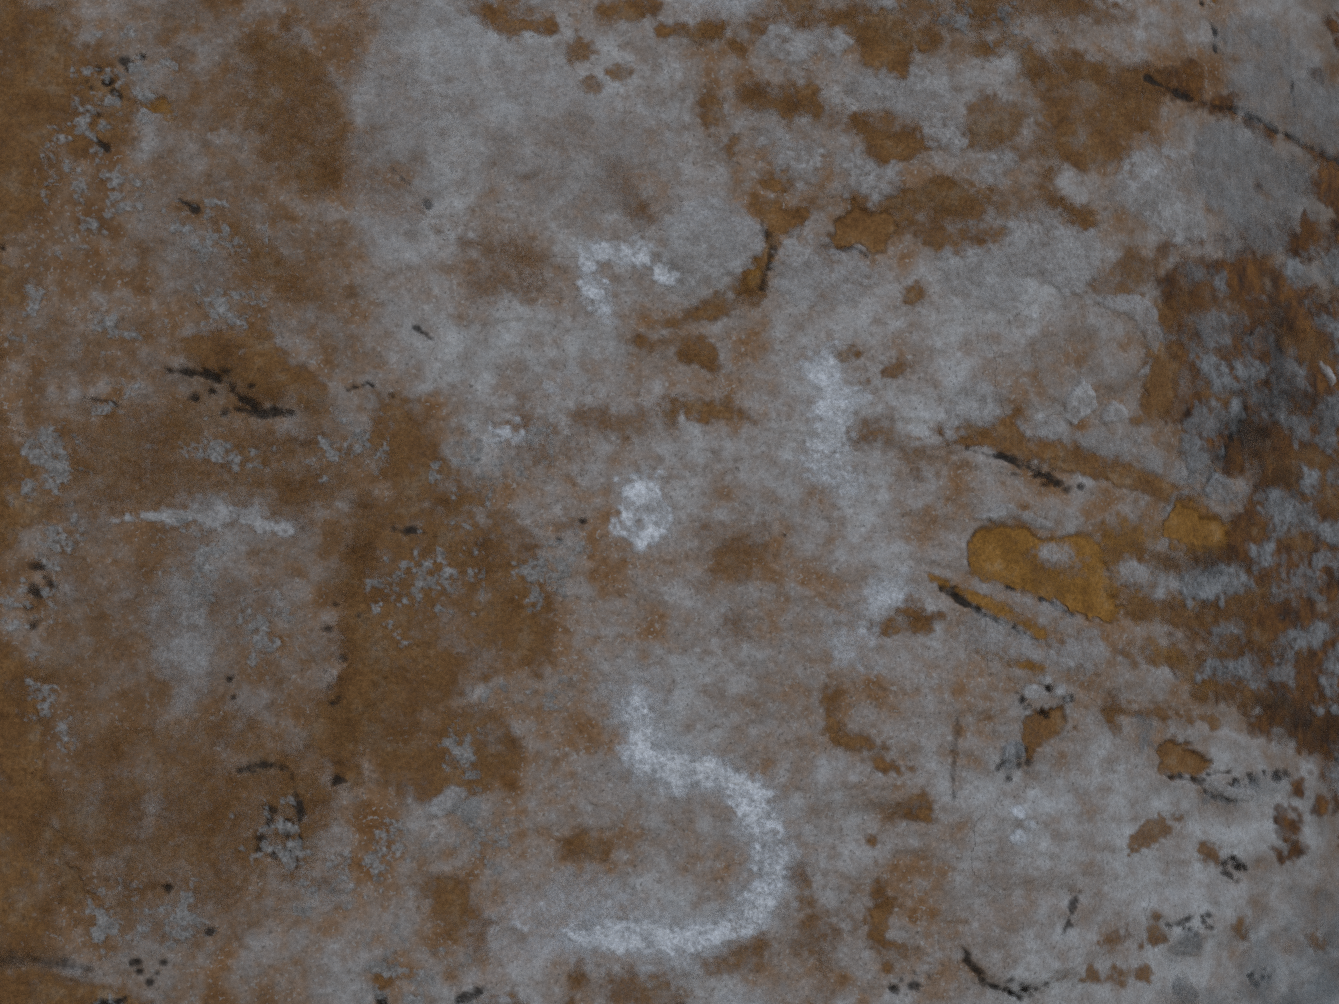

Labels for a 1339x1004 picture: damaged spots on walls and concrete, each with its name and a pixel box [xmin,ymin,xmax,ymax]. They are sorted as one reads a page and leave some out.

corrosion [470,0,591,62]
corrosion [596,0,811,58]
corrosion [828,6,942,82]
corrosion [0,0,138,250]
corrosion [743,71,939,169]
corrosion [957,0,1288,232]
crack [1144,74,1339,164]
spalling [968,505,1124,623]
corrosion [928,145,1339,864]
spalling [1163,492,1231,554]
spalling [999,696,1075,778]
spalling [1156,740,1289,801]